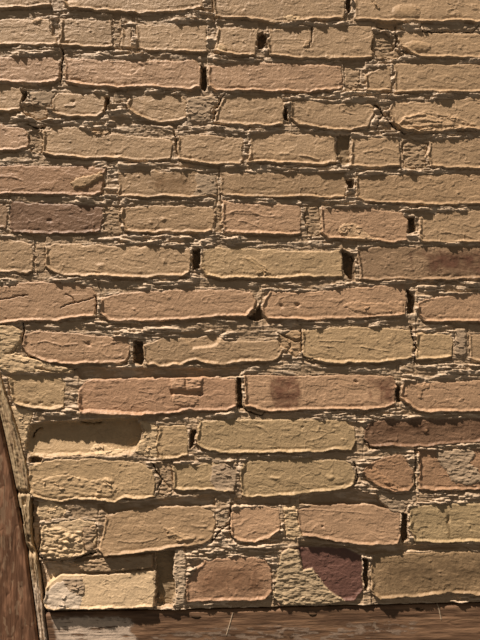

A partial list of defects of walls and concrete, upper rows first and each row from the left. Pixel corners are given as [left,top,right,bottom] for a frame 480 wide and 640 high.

crack [374,105,405,135]